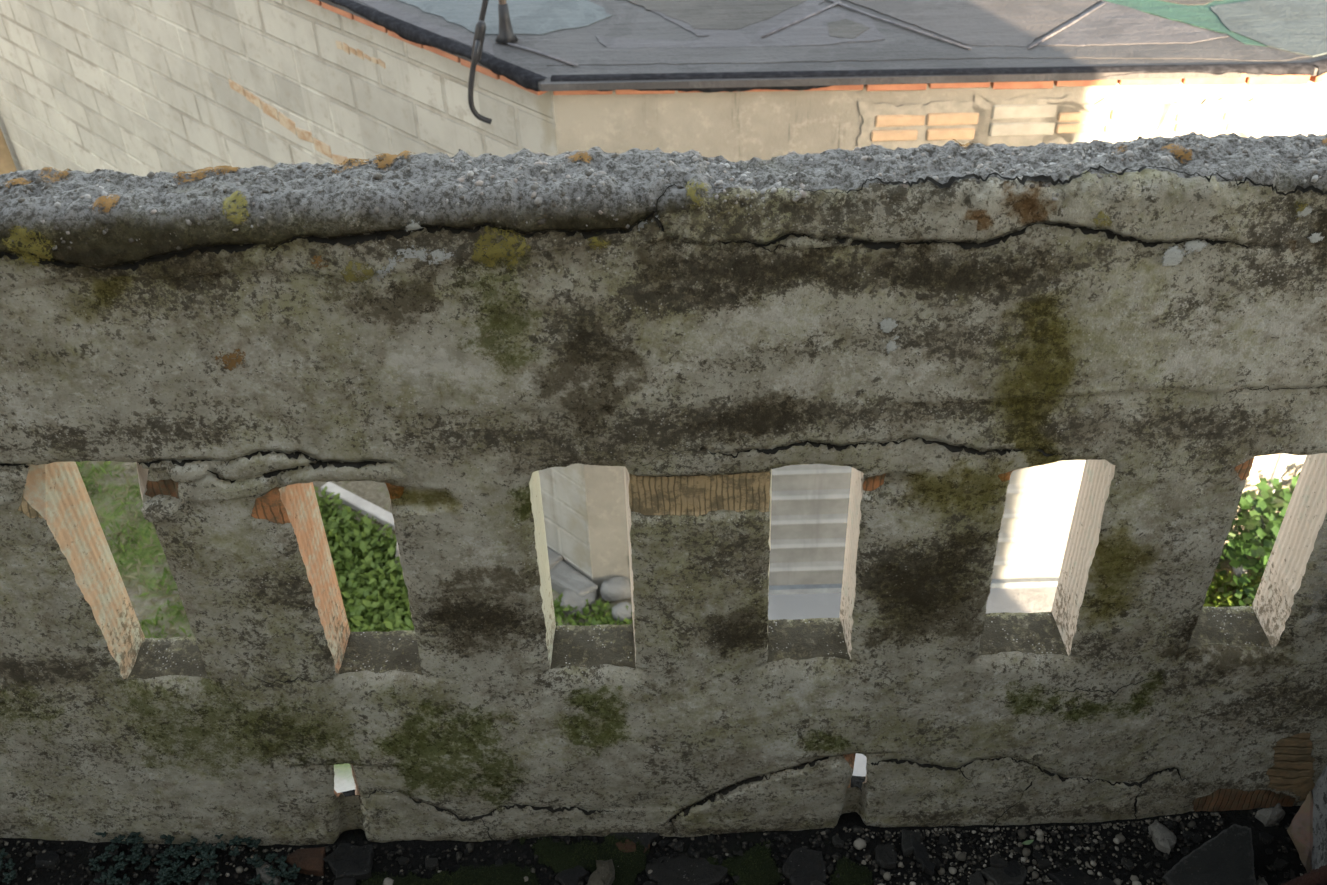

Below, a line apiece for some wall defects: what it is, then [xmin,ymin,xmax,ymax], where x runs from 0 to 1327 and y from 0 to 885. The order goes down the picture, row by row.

crack [807,165,1327,196]
crack [0,183,1275,272]
crack [0,461,29,469]
crack [136,451,393,484]
crack [640,437,1067,466]
crack [669,757,829,832]
crack [362,789,616,842]